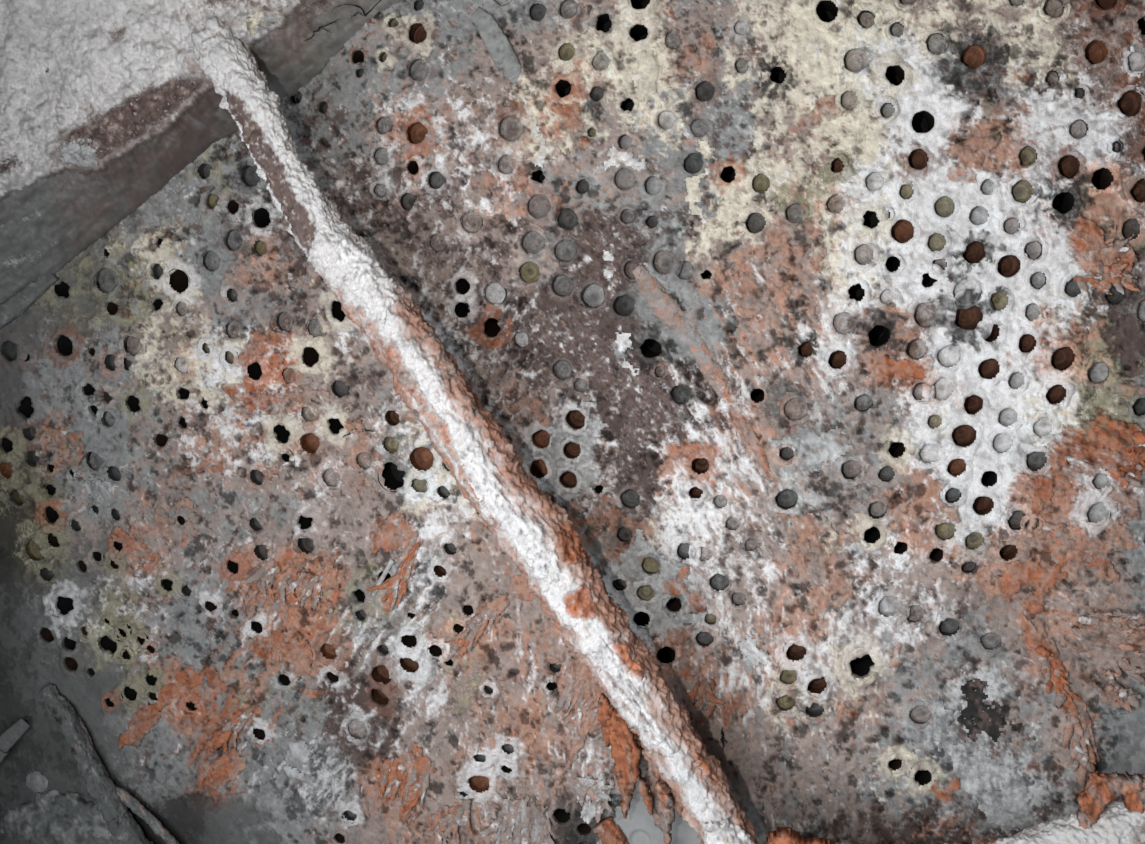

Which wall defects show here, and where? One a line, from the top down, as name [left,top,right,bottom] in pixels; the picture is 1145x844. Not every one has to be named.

damp [560,215,648,297]
corrosion [1040,213,1141,343]
damp [1083,382,1126,419]
corrosion [117,663,231,750]
corrosion [241,548,345,617]
corrosion [366,508,423,615]
corrosion [444,575,536,662]
corrosion [610,638,645,680]
corrosion [665,627,749,731]
corrosion [993,408,1145,829]
corrosion [374,742,473,844]
corrosion [764,826,835,844]